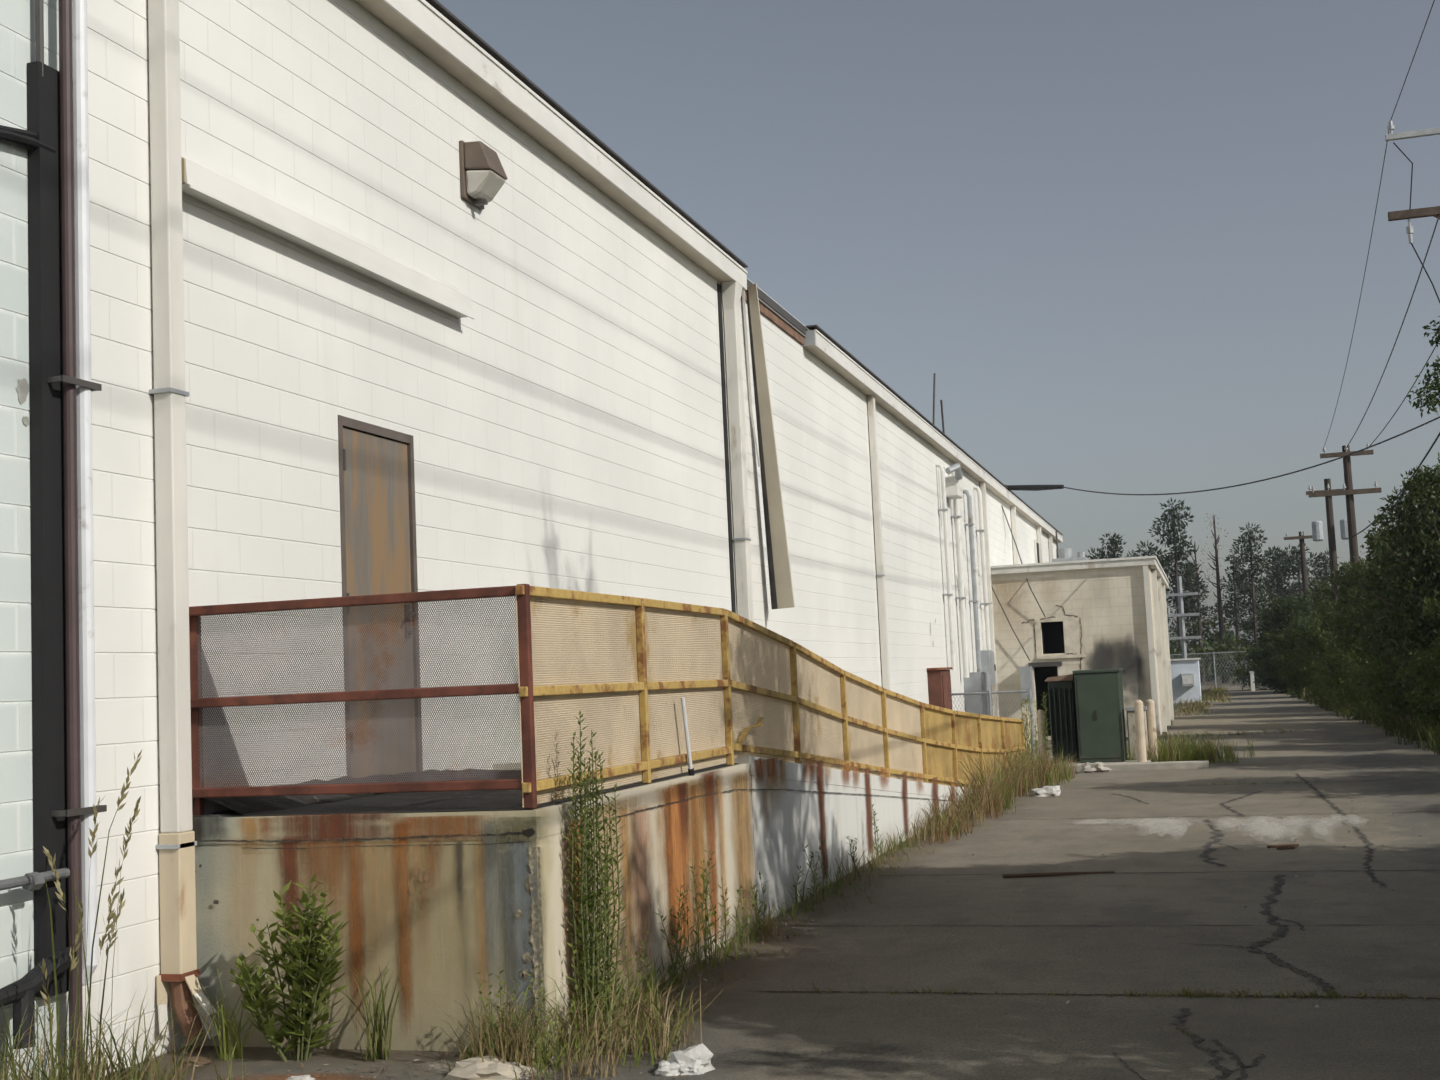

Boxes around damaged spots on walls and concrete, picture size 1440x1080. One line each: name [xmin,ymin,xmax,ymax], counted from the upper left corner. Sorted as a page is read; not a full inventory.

rust [281,813,484,1009]
rust [569,800,651,1006]
rust [665,758,785,947]
rust [804,757,828,880]
rust [843,763,968,853]
crack [1200,791,1261,866]
crack [1203,876,1335,992]
crack [1295,774,1386,886]
crack [1170,1008,1265,1080]